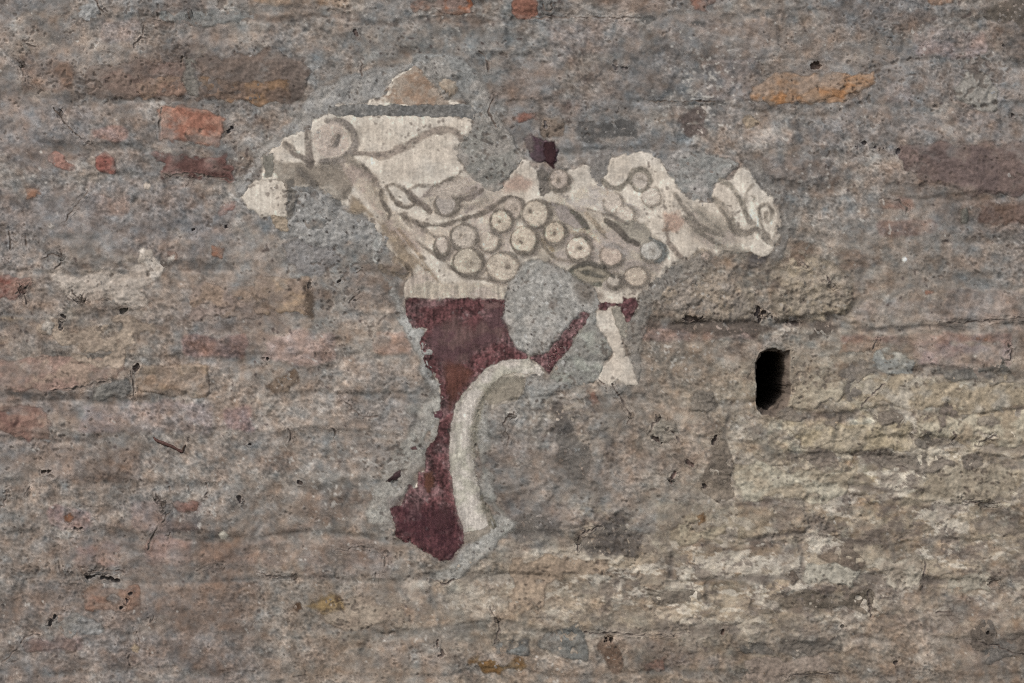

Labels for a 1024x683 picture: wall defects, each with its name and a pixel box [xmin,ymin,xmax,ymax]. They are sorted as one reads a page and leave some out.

peeling [513,113,565,169]